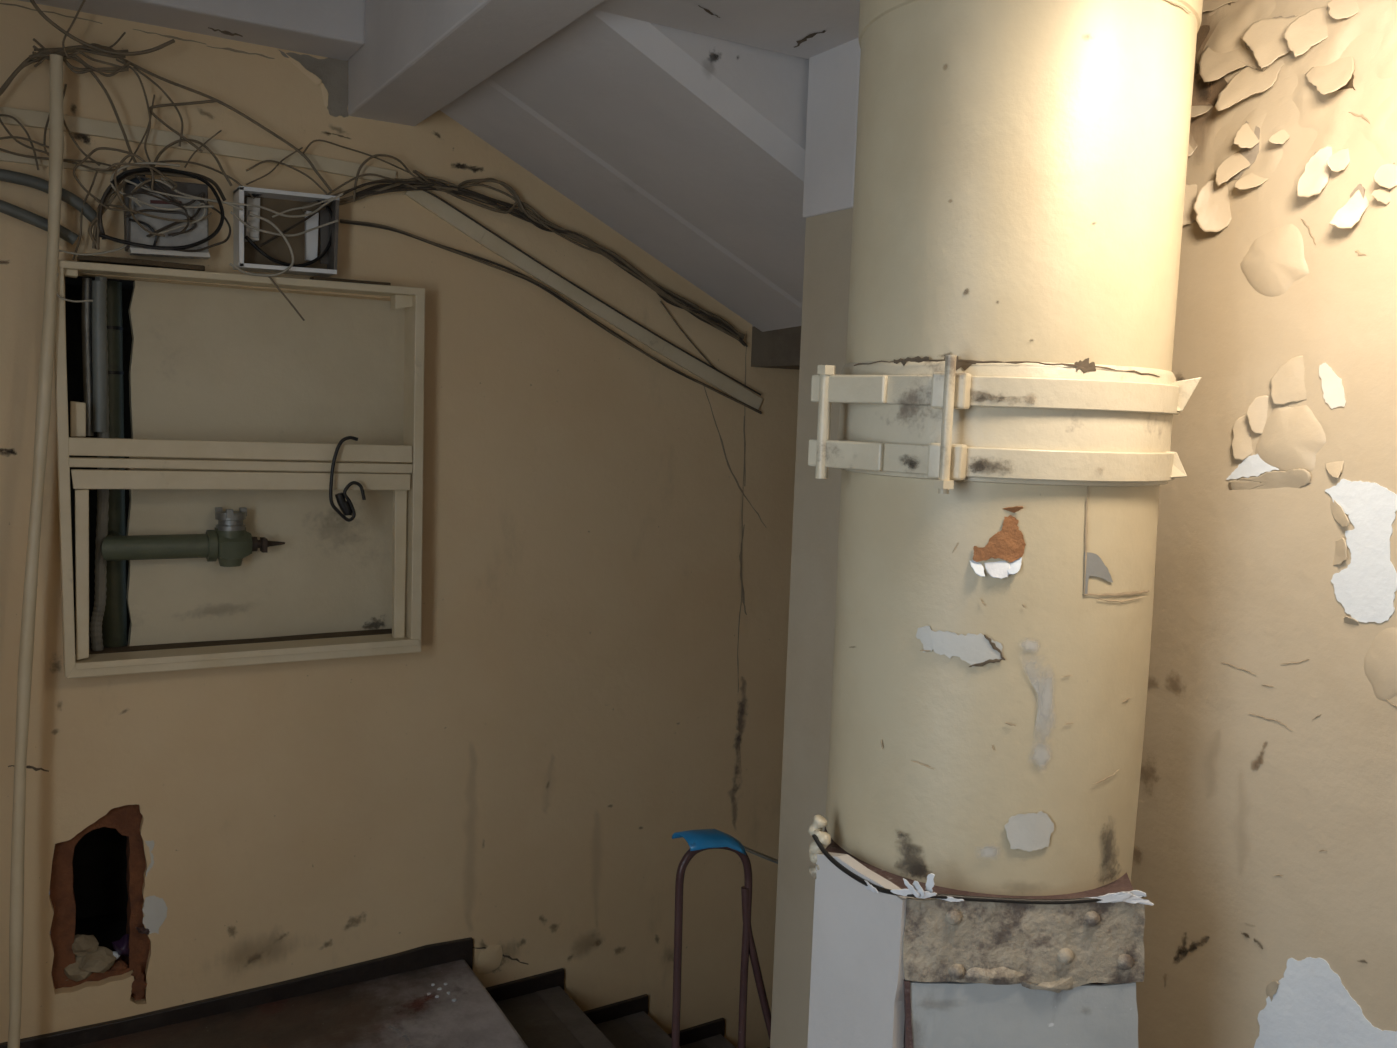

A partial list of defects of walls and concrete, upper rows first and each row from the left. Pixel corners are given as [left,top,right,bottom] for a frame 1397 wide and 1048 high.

flaking render [279,50,349,117]
peeling [1188,0,1360,157]
peeling [1183,121,1290,232]
crack [704,331,766,691]
peeling [970,506,1026,579]
peeling [1226,356,1397,625]
peeling [916,626,1005,667]
peeling [982,811,1054,856]
spalling [50,804,168,1000]
peeling [1254,957,1397,1048]